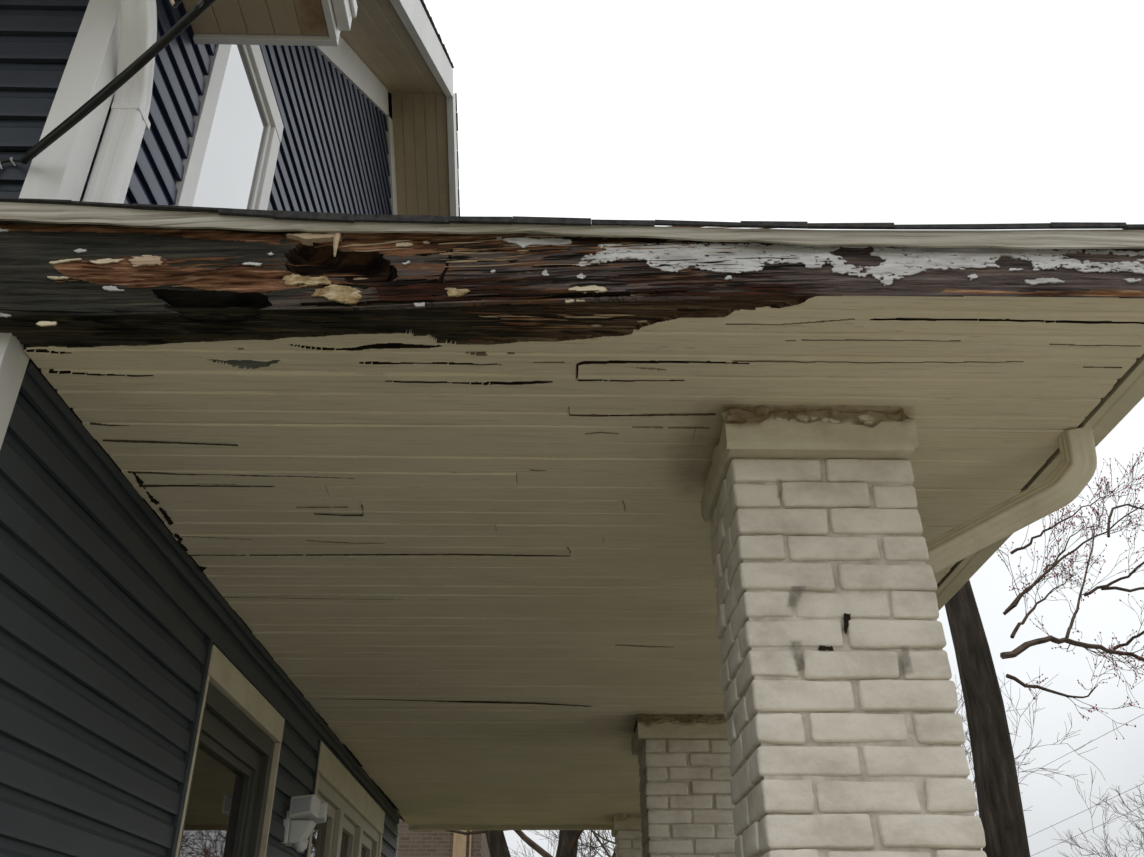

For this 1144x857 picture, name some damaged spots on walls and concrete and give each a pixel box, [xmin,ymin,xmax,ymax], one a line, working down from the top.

peeling [496,237,572,248]
peeling [47,249,124,280]
spalling [242,242,410,290]
peeling [565,242,1144,303]
spalling [152,289,272,325]
crack [290,318,1144,385]
crack [90,422,238,446]
crack [568,406,716,434]
crack [128,471,354,487]
crack [180,505,571,557]
crack [616,642,674,650]